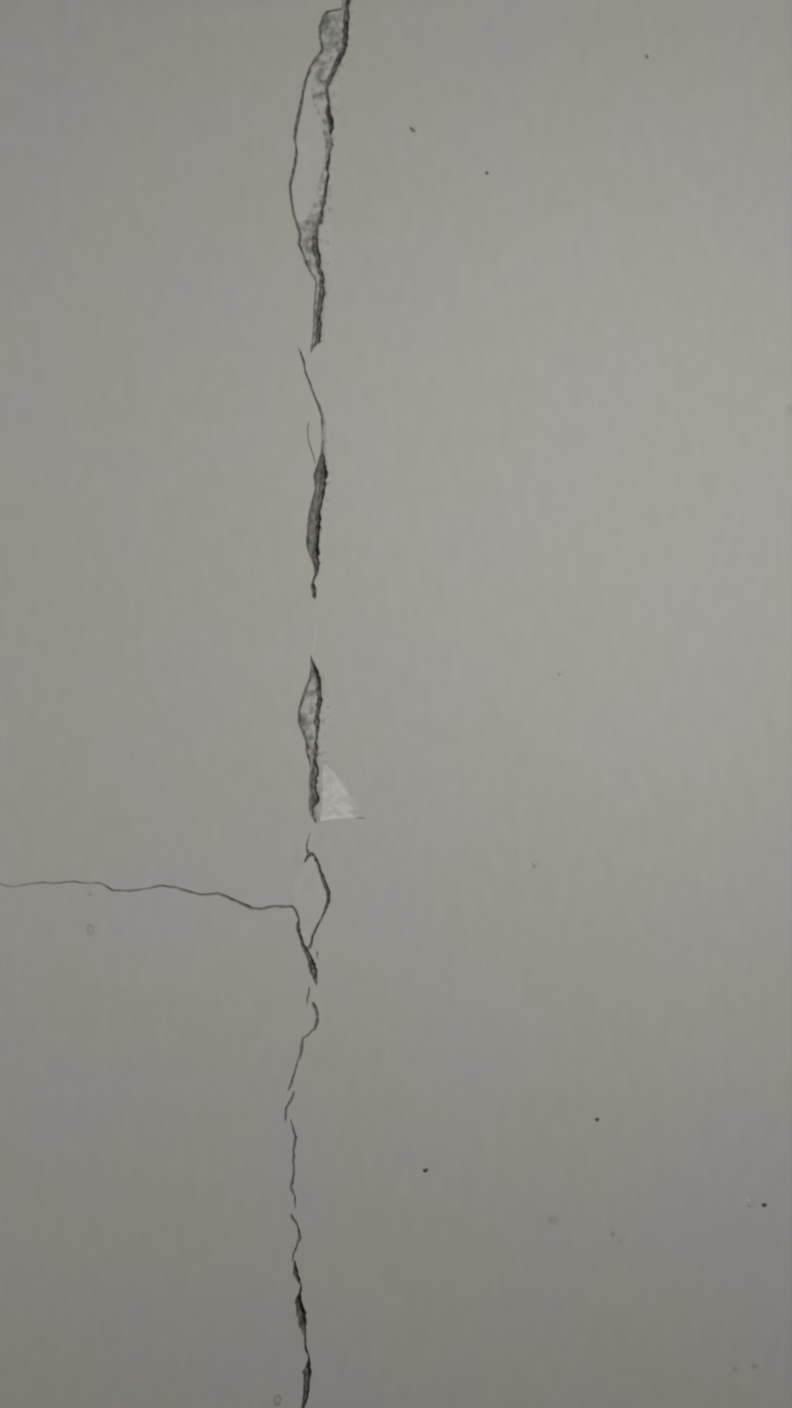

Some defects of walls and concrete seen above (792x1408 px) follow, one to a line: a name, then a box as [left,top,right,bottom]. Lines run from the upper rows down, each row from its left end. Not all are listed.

crack [0,0,356,1408]
peeling [320,760,364,821]